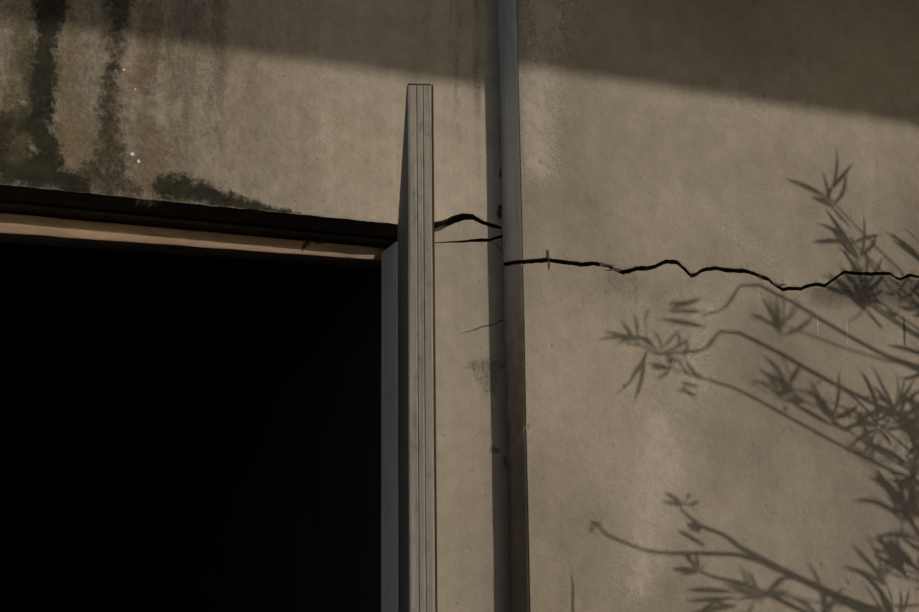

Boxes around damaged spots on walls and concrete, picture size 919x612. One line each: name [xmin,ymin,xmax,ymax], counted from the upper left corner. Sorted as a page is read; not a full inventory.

damp [8,0,301,213]
crack [434,213,919,292]
crack [460,320,503,334]